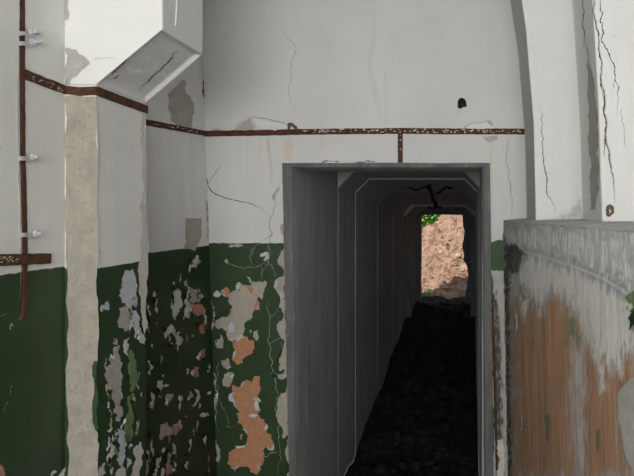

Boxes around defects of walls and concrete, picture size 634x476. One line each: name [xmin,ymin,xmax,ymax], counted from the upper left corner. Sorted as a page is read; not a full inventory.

spalling [64,48,89,85]
spalling [168,79,194,128]
crack [582,0,625,203]
corrosion [0,0,525,319]
crack [541,111,556,213]
crack [207,166,279,277]
flaking render [51,95,287,476]
peeling [276,388,289,476]